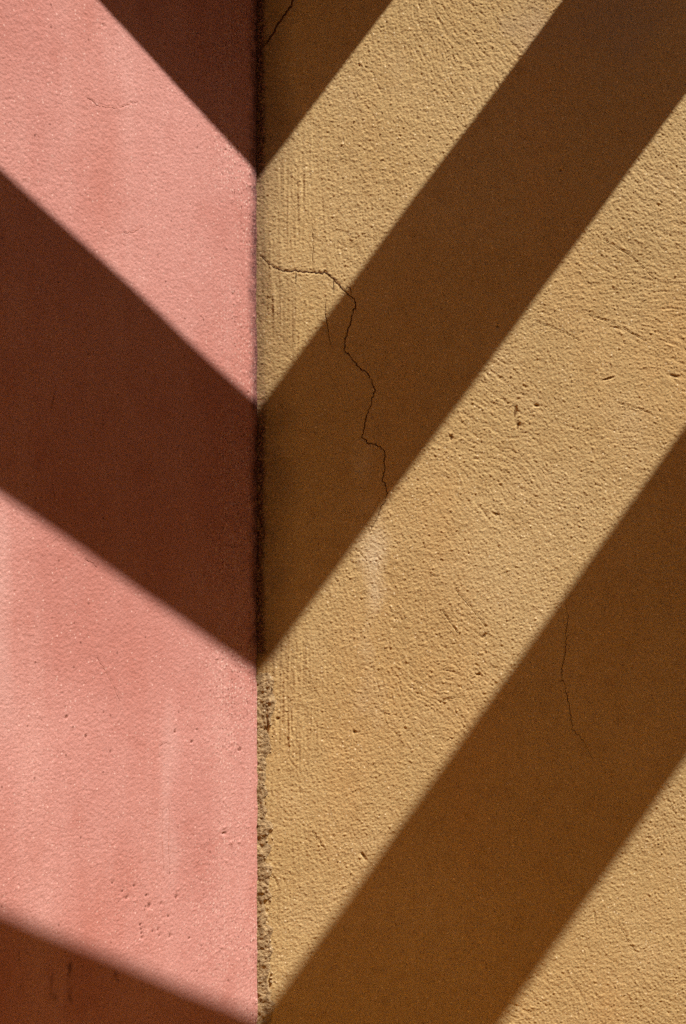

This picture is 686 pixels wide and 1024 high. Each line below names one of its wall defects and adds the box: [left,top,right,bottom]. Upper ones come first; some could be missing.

crack [261,0,294,50]
crack [261,256,388,527]